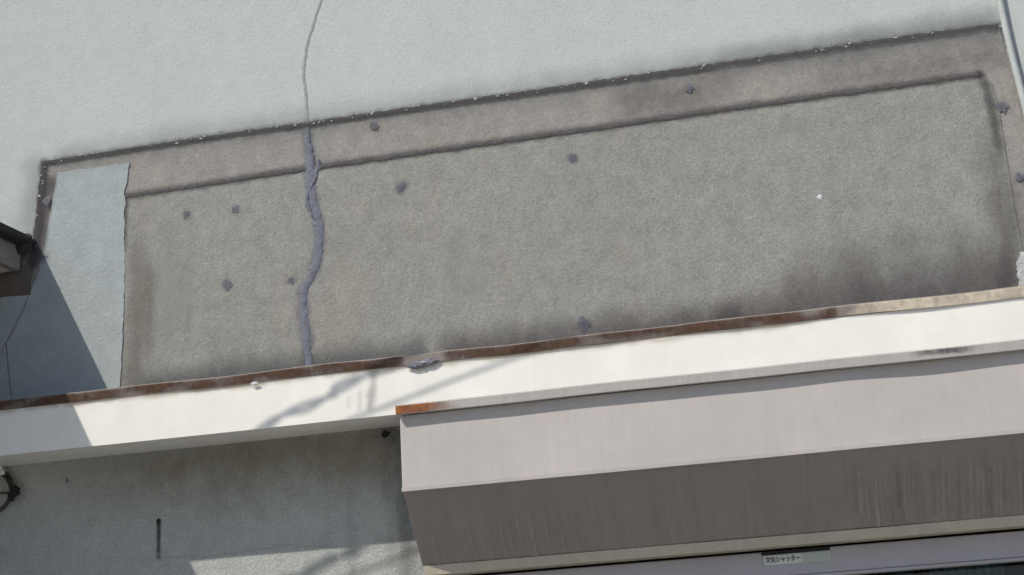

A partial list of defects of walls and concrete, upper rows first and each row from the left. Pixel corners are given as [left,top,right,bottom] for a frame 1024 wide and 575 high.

crack [124,0,998,366]
water stain [760,277,1006,315]
rust [593,307,835,343]
crack [0,295,29,399]
rust [445,336,580,358]
rust [0,356,402,409]
rust [395,402,438,414]